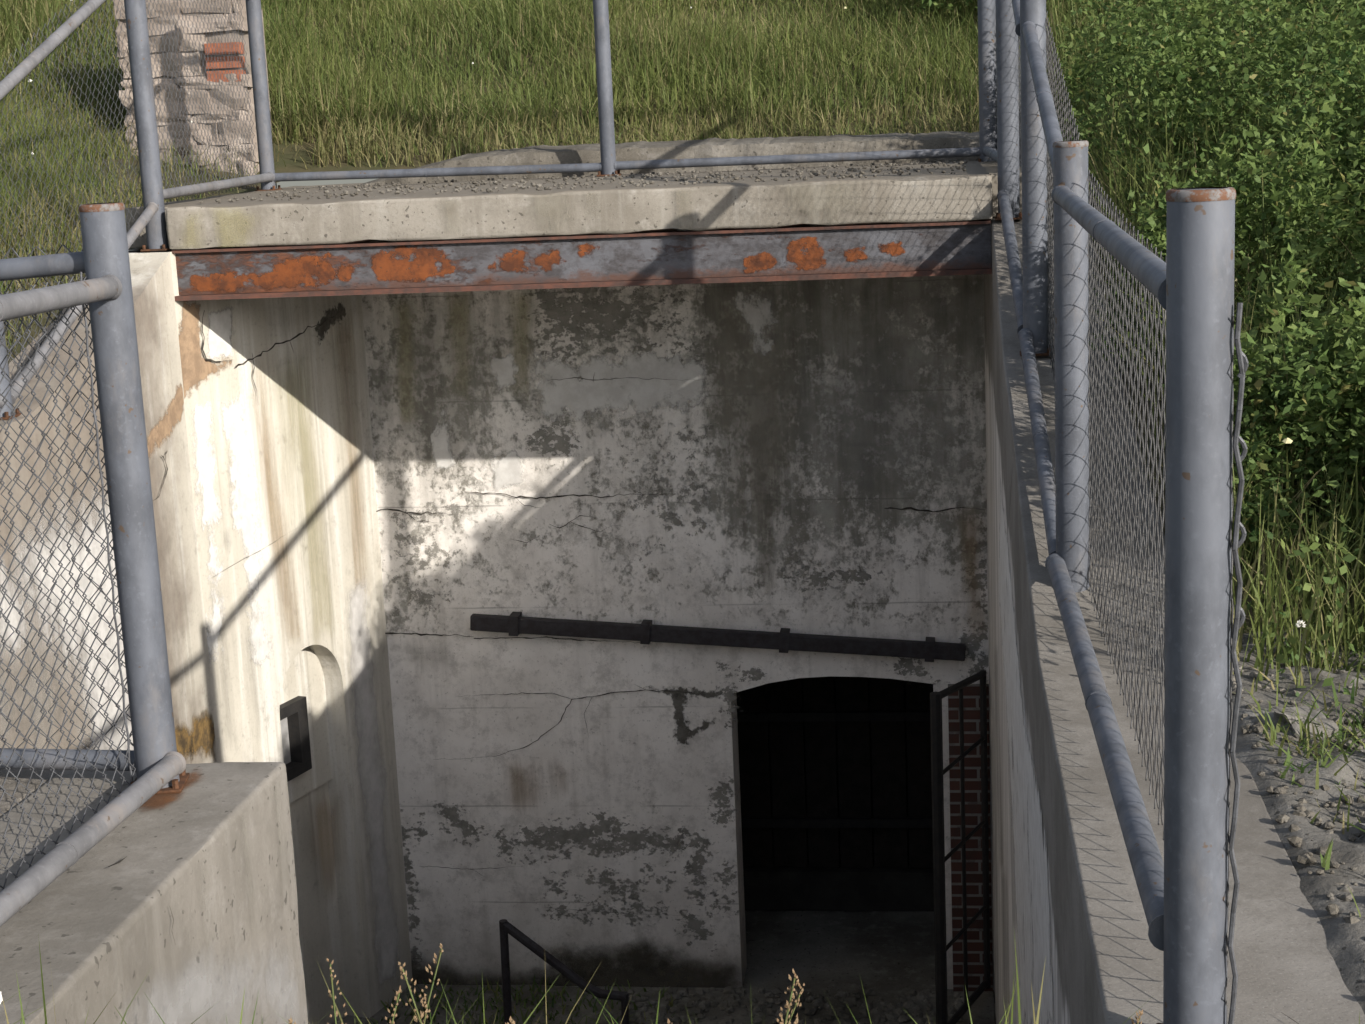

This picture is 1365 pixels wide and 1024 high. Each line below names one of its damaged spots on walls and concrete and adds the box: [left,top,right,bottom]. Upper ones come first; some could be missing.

corrosion [190,253,355,293]
corrosion [371,245,455,283]
corrosion [488,243,600,272]
corrosion [743,236,826,274]
corrosion [844,242,906,263]
peeling [522,285,705,369]
crack [202,310,338,404]
peeling [431,411,455,468]
crack [376,492,664,543]
peeling [621,423,713,568]
crack [443,686,695,760]
peeling [401,777,739,967]